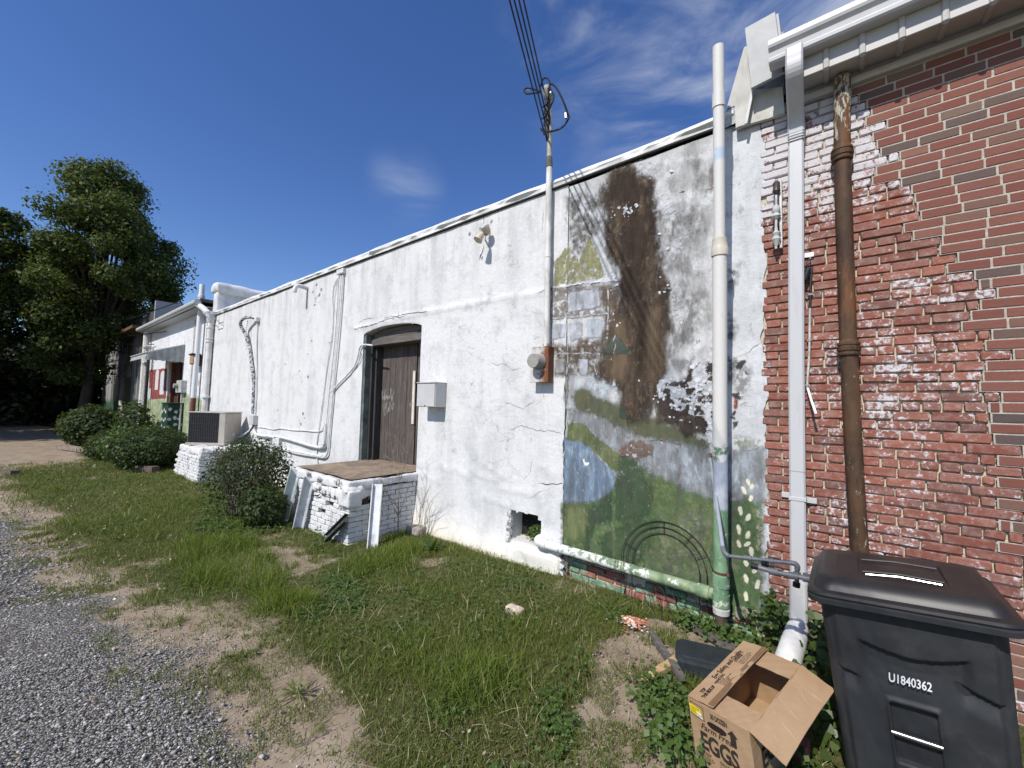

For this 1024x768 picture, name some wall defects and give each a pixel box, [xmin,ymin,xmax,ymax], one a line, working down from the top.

spalling [506,509,528,542]
crack [504,283,585,574]
leakage [567,162,706,424]
peeling [653,359,713,450]